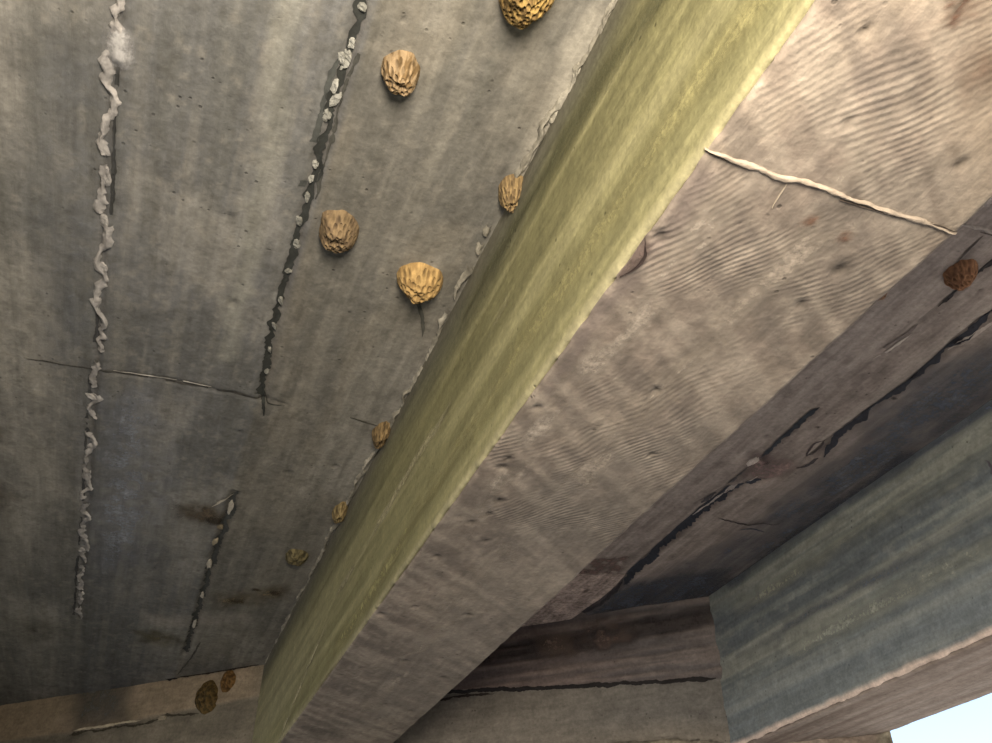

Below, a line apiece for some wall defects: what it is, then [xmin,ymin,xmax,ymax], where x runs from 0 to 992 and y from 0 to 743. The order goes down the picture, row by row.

crack [29,0,367,619]
crack [704,147,992,273]
crack [938,290,957,307]
crack [582,310,992,613]
crack [166,491,256,681]
crack [440,676,716,701]